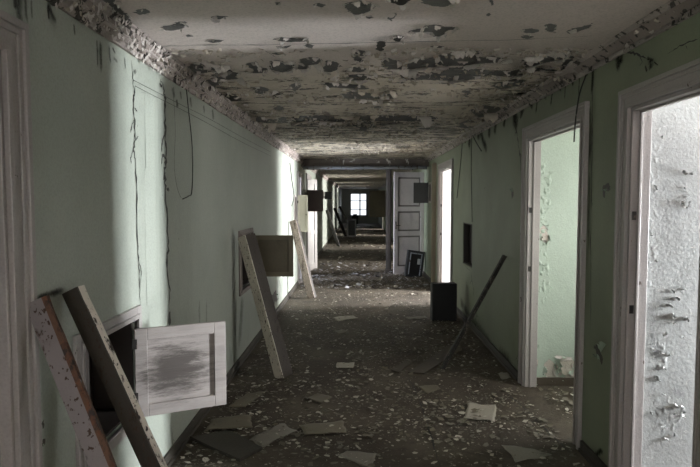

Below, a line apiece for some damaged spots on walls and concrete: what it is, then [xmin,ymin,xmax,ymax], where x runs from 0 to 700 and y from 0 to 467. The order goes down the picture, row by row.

peeling [49,0,593,161]
crack [130,60,142,305]
crack [160,79,171,302]
peeling [540,224,552,245]
peeling [543,355,574,381]